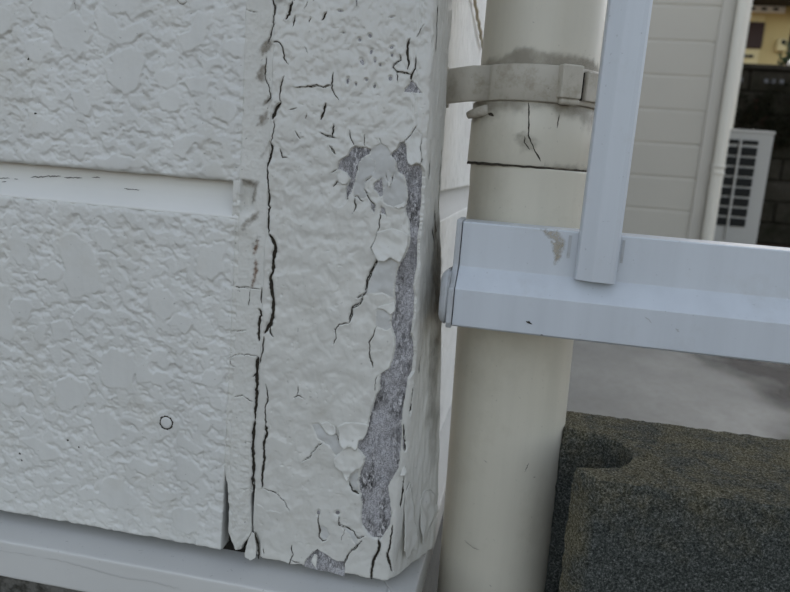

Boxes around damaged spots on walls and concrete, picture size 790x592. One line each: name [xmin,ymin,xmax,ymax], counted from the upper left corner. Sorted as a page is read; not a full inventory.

crack [230,0,339,491]
peeling [289,129,438,576]
crack [370,525,393,579]
crack [467,102,587,172]